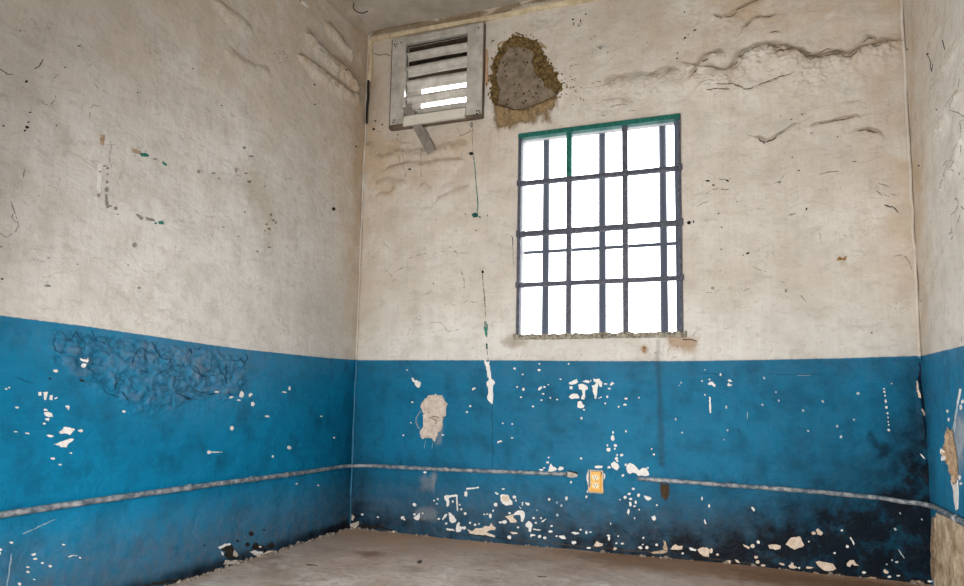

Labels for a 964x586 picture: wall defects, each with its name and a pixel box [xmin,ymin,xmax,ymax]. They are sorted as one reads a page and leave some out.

flaking render [488,32,567,113]
crack [666,0,884,90]
crack [758,114,877,144]
crack [687,178,806,301]
peeling [38,392,83,454]
flaking render [410,394,448,442]
peeling [472,359,495,405]
peeling [532,378,614,419]
peeling [433,487,624,550]
peeling [619,488,658,521]
flaking render [916,389,964,586]
peeling [638,537,740,564]